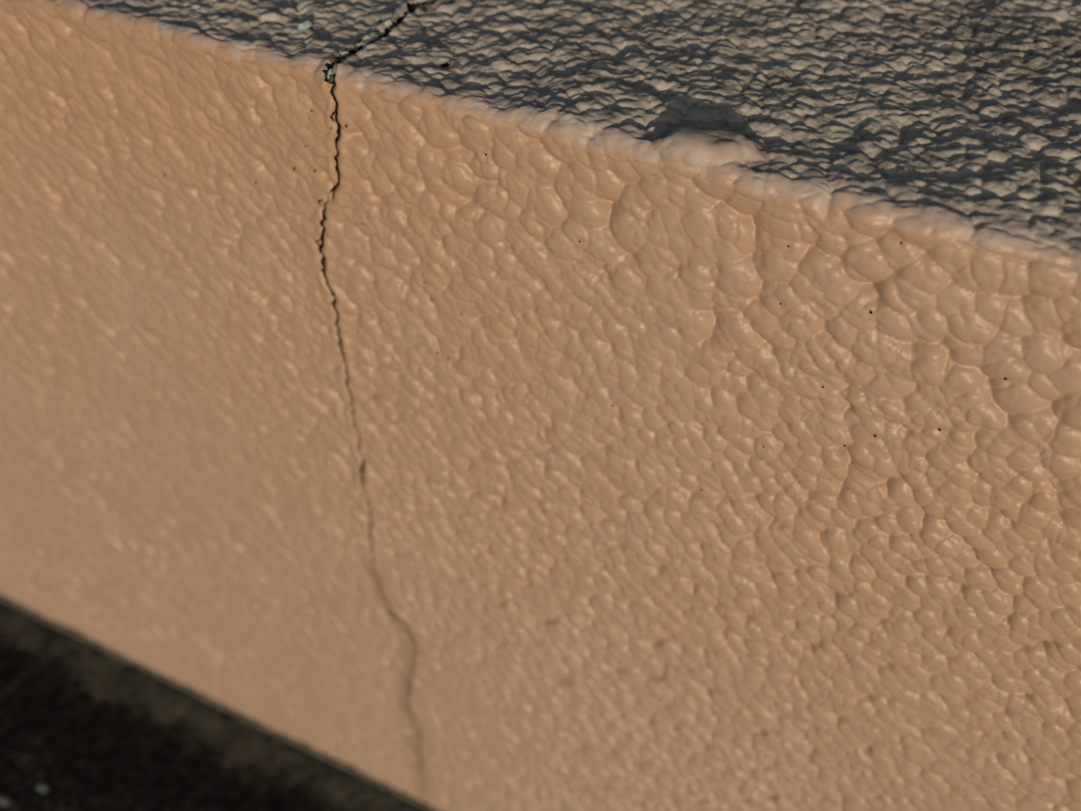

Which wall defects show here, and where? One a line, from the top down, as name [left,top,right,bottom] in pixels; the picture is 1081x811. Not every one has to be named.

crack [315,0,453,790]